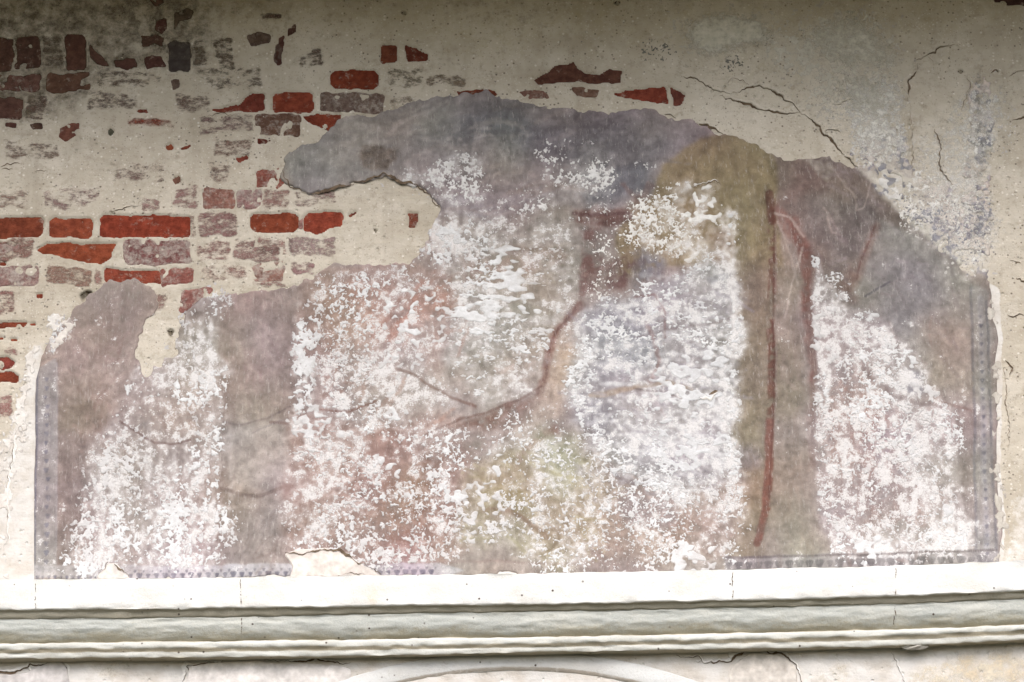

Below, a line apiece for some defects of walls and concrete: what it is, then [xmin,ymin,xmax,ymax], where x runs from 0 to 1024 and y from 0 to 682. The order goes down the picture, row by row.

crack [665,113,723,134]
crack [683,75,861,167]
crack [903,43,953,185]
crack [962,69,1024,108]
peeling [0,8,752,579]